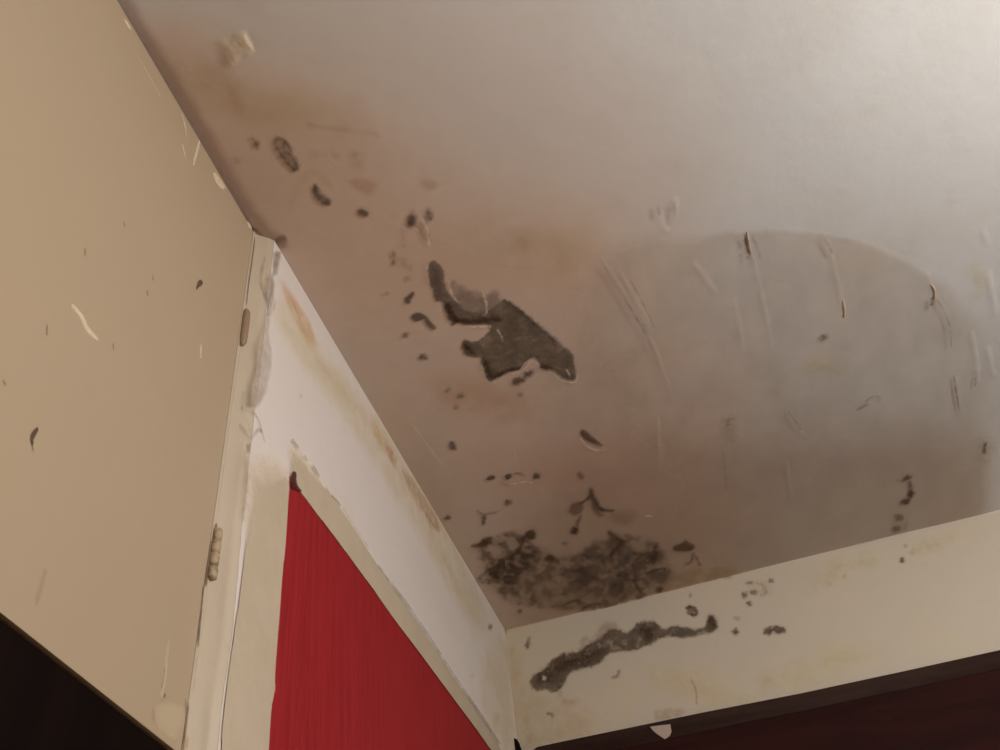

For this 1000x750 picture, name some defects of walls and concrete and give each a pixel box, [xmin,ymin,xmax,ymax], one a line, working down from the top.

water stain [405,292,436,330]
water stain [472,530,671,609]